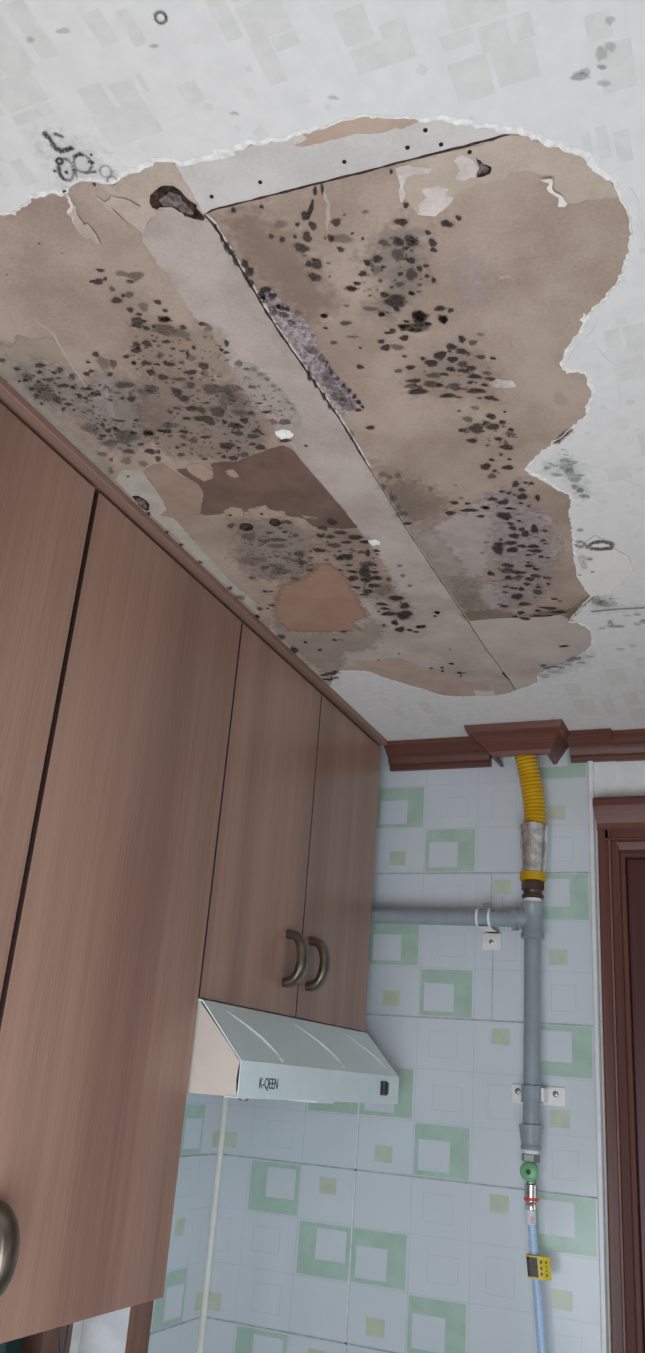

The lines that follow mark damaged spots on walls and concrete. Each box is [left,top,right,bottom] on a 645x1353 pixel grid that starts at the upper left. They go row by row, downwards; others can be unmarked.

damp [42,132,96,193]
damp [214,224,254,288]
damp [0,269,440,653]
peeling [275,429,294,439]
flaking render [257,287,364,418]
damp [269,203,590,620]